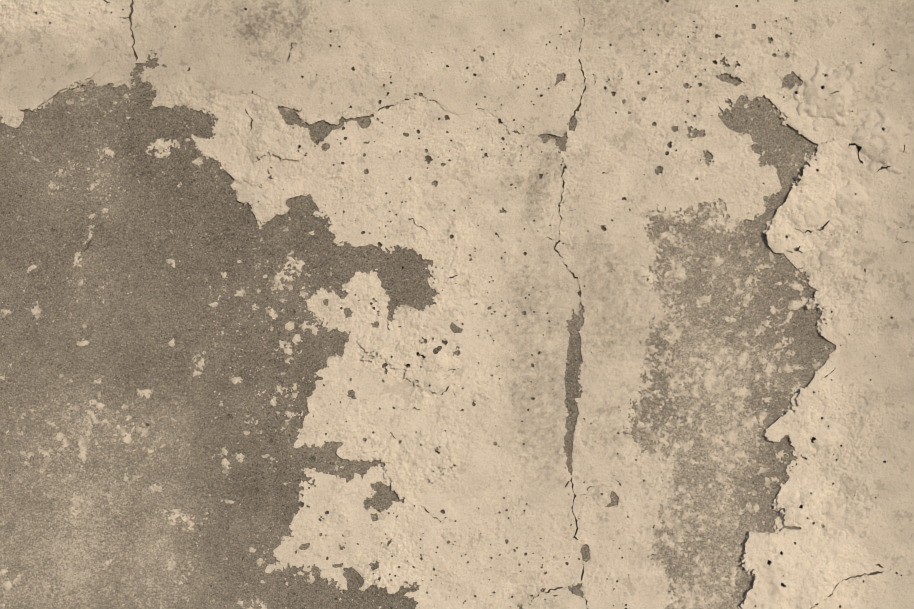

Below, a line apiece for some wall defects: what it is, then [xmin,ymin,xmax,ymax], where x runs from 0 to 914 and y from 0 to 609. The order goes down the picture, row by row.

crack [104,0,138,59]
crack [547,158,581,297]
peeling [0,50,440,609]
peeling [442,322,463,356]
peeling [618,57,836,609]
crack [565,478,594,540]
crack [532,564,588,609]
crack [810,564,891,609]